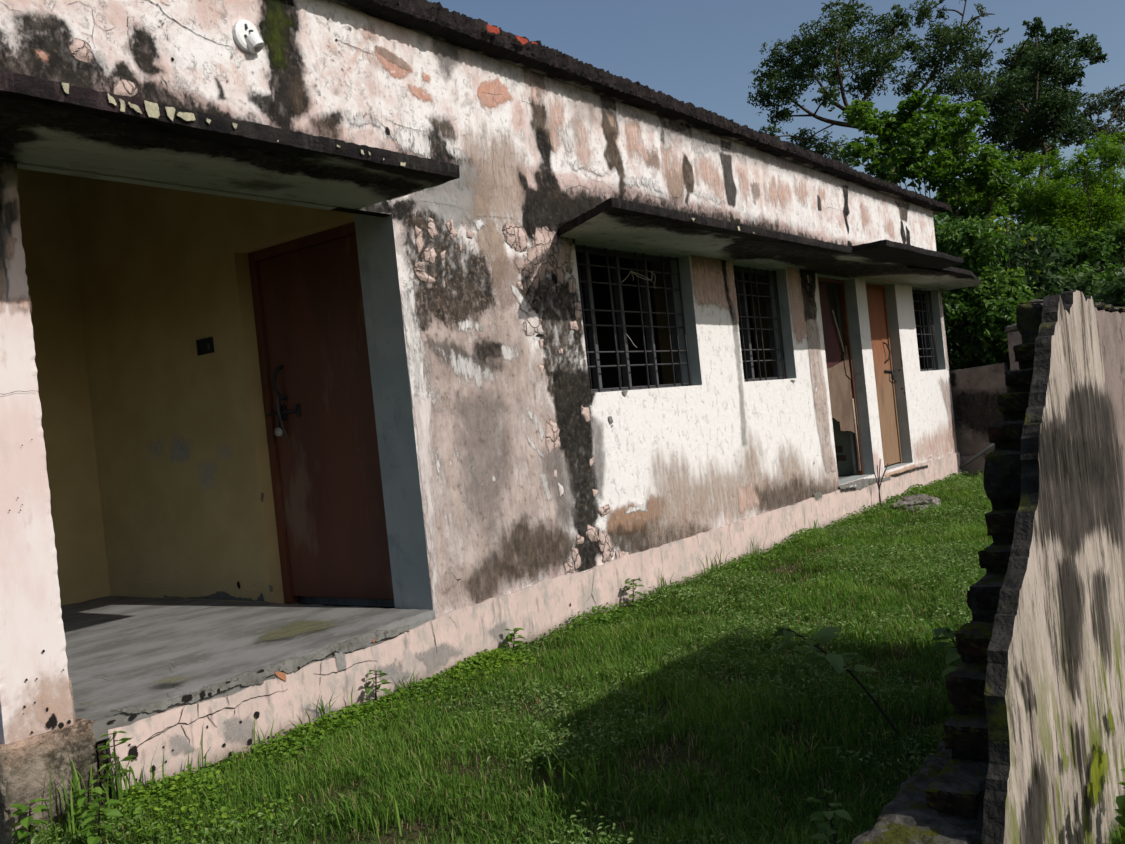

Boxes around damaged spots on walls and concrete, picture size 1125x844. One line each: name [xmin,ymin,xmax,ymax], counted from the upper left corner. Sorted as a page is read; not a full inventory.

water stain [0,0,342,139]
peeling [335,29,433,102]
peeling [477,71,603,176]
peeling [474,219,521,308]
water stain [0,95,1009,616]
peeling [502,345,519,361]
crack [102,662,286,789]